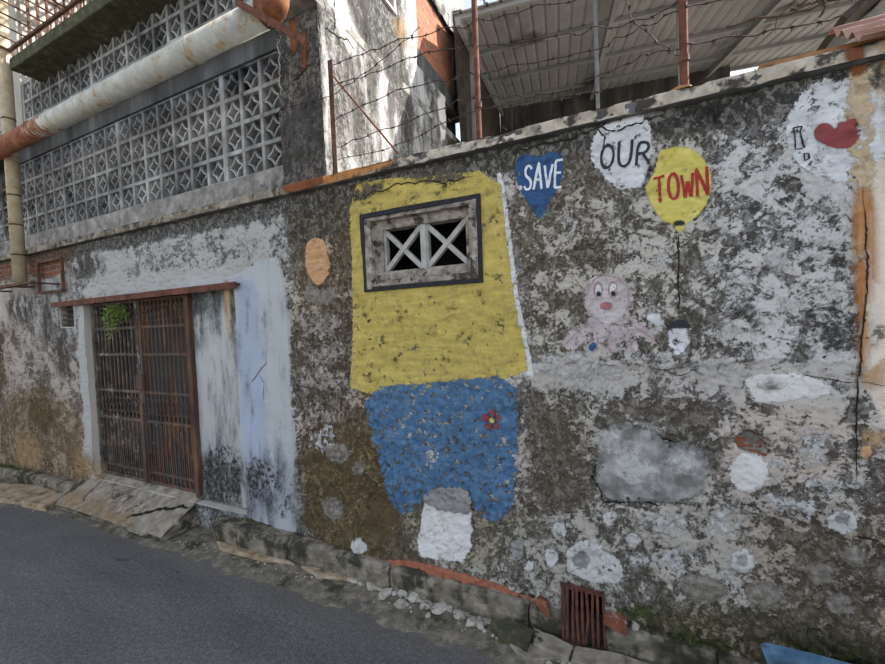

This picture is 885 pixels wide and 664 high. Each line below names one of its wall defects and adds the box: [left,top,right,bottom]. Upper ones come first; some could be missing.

crack [324,0,354,49]
rust [843,45,884,386]
leakage [7,296,68,375]
crack [797,186,884,490]
leakage [16,388,52,468]
crack [126,504,189,518]
leakage [204,445,277,503]
peeling [510,538,534,571]
spalling [545,420,847,584]
spalling [802,510,885,588]
spalling [603,610,627,636]